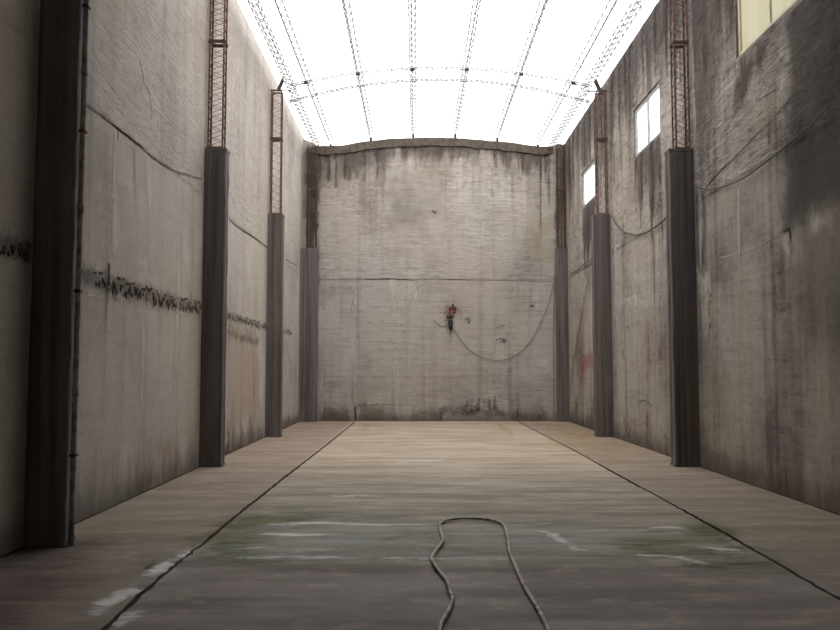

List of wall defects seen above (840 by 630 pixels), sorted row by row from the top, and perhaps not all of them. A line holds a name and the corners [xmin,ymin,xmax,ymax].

leakage [693,0,734,160]
leakage [735,46,764,104]
crack [87,104,201,179]
leakage [319,146,479,178]
leakage [494,149,550,183]